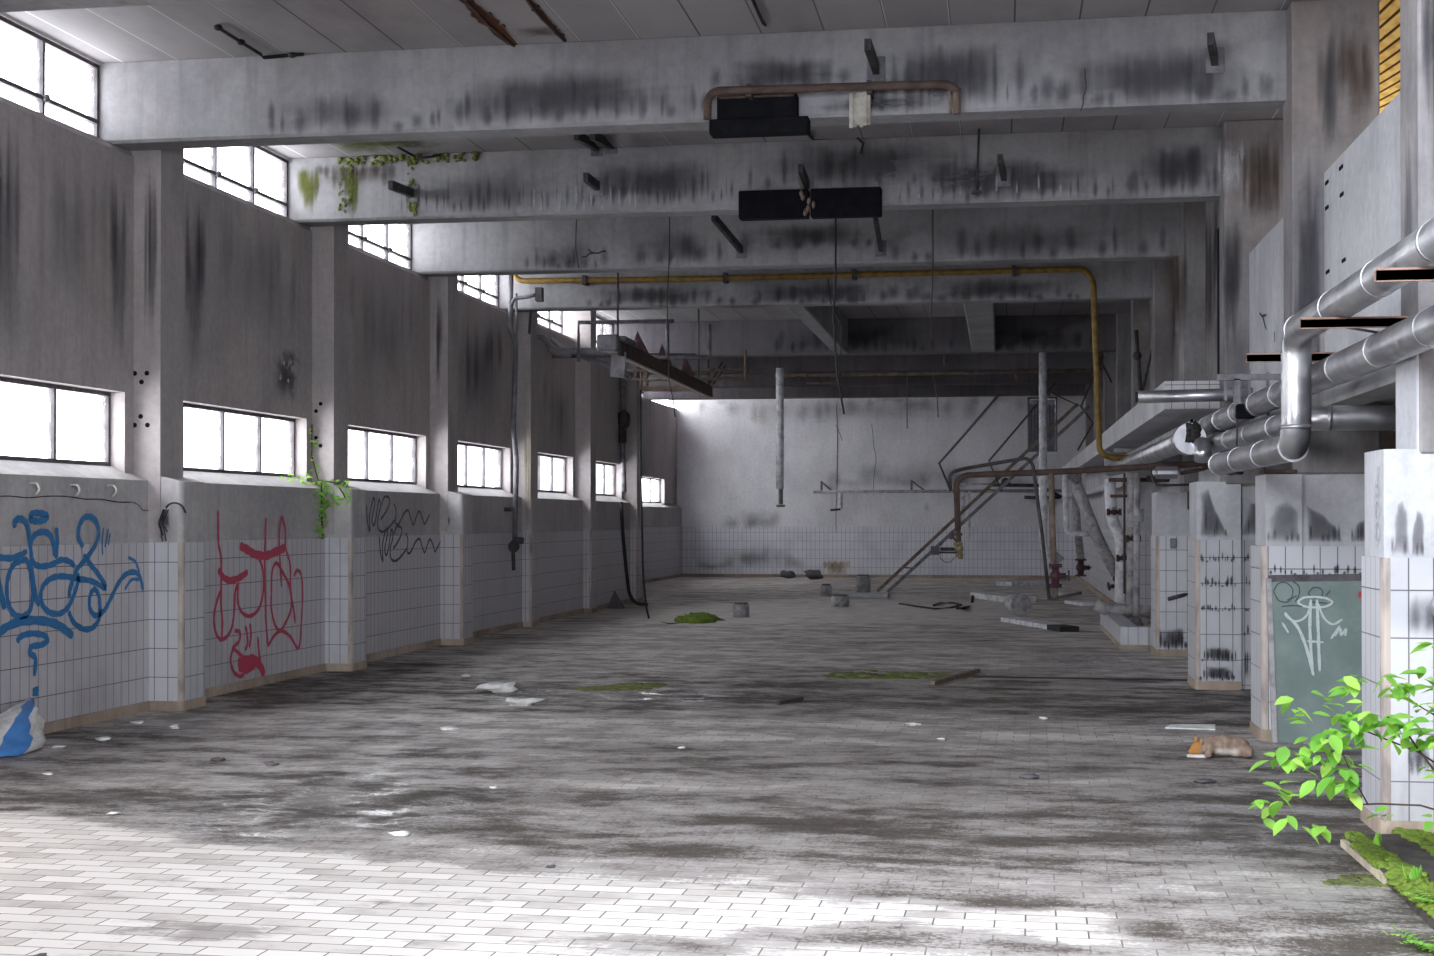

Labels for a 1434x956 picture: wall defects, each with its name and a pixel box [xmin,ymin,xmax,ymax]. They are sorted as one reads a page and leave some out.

spalling [459,0,518,47]
spalling [525,0,566,42]
leakage [1424,0,1434,69]
leakage [1115,61,1211,93]
leakage [503,80,622,112]
leakage [619,290,680,301]
leakage [1204,497,1222,533]
leakage [1241,505,1292,537]
leakage [1310,512,1340,539]
leakage [1400,519,1423,550]
leakage [1201,553,1250,587]
leakage [1200,649,1248,681]